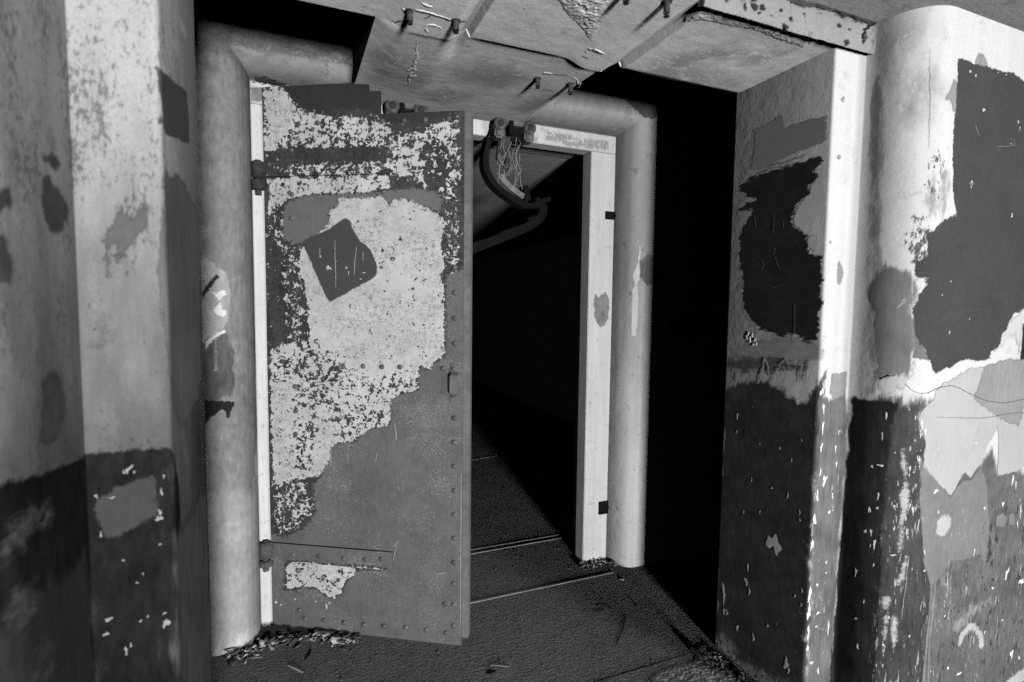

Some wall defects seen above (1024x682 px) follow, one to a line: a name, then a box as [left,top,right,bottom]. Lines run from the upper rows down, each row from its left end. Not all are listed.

peeling [0,32,261,682]
peeling [794,169,832,252]
peeling [647,374,1024,682]